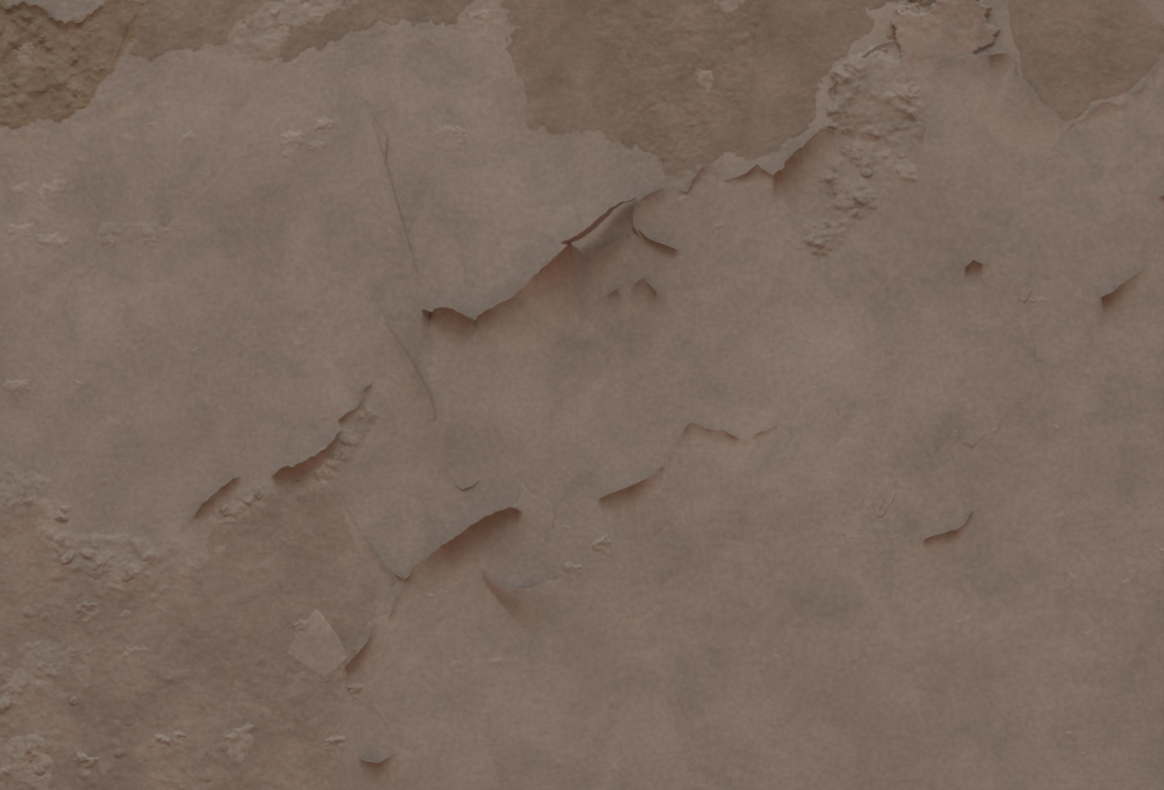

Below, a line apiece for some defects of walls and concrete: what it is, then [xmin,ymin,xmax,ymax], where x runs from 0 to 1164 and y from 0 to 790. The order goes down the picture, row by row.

spalling [0,0,475,130]
flaking render [422,0,1164,355]
peeling [170,474,243,546]
peeling [272,381,375,495]
peeling [402,484,567,634]
peeling [598,421,786,518]
peeling [917,510,973,554]
spalling [0,733,55,790]
peeling [324,735,398,790]